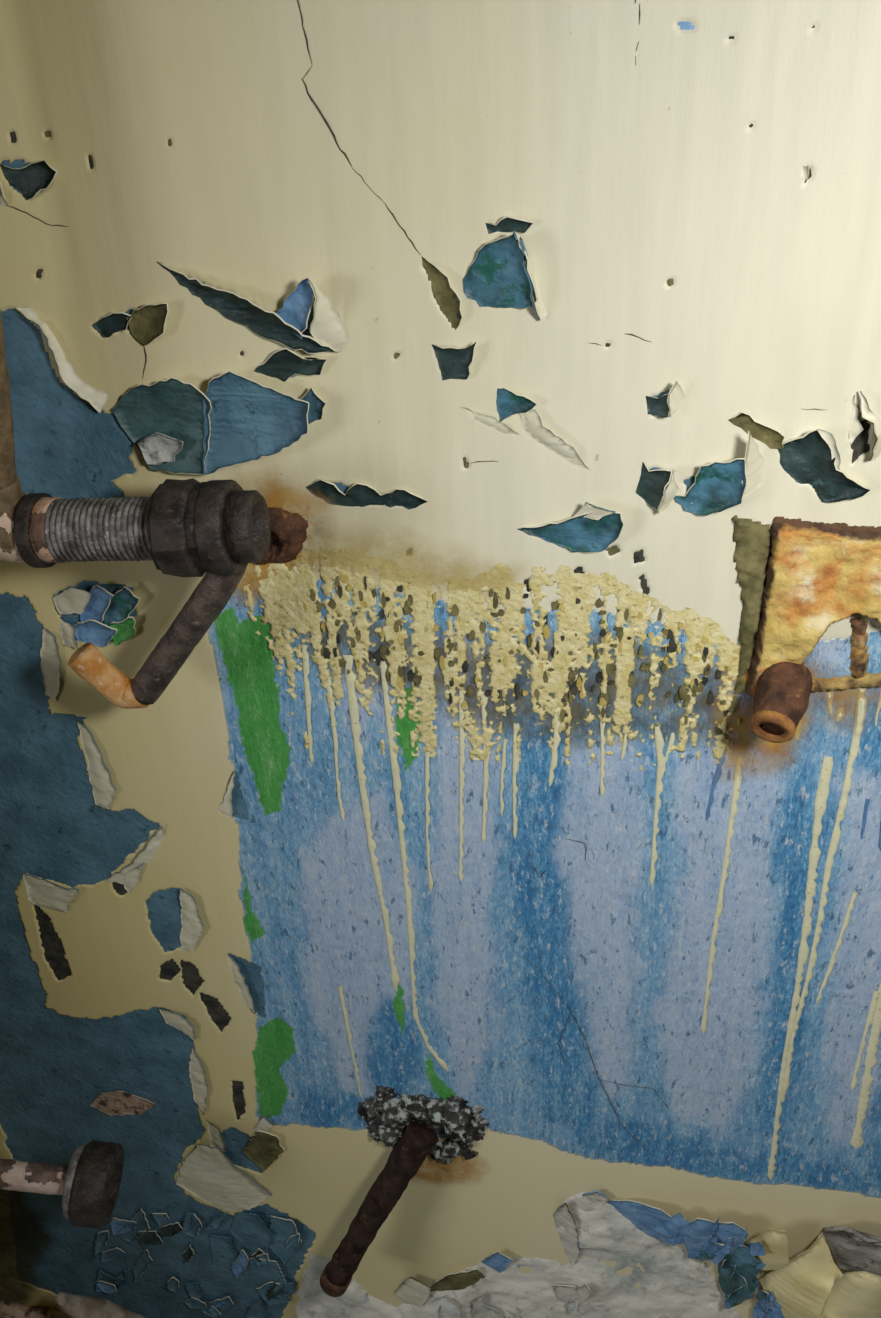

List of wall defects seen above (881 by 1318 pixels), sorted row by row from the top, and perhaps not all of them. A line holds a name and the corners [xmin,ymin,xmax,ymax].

crack [297,0,421,255]
peeling [1,262,350,499]
corrosion [237,483,309,595]
damp [326,654,449,1071]
peeling [0,580,881,1318]
peeling [421,216,548,330]
peeling [242,502,746,771]
damp [481,692,520,842]
damp [649,726,675,885]
peeling [635,391,881,516]
corrosion [728,617,881,764]
damp [768,687,881,1180]